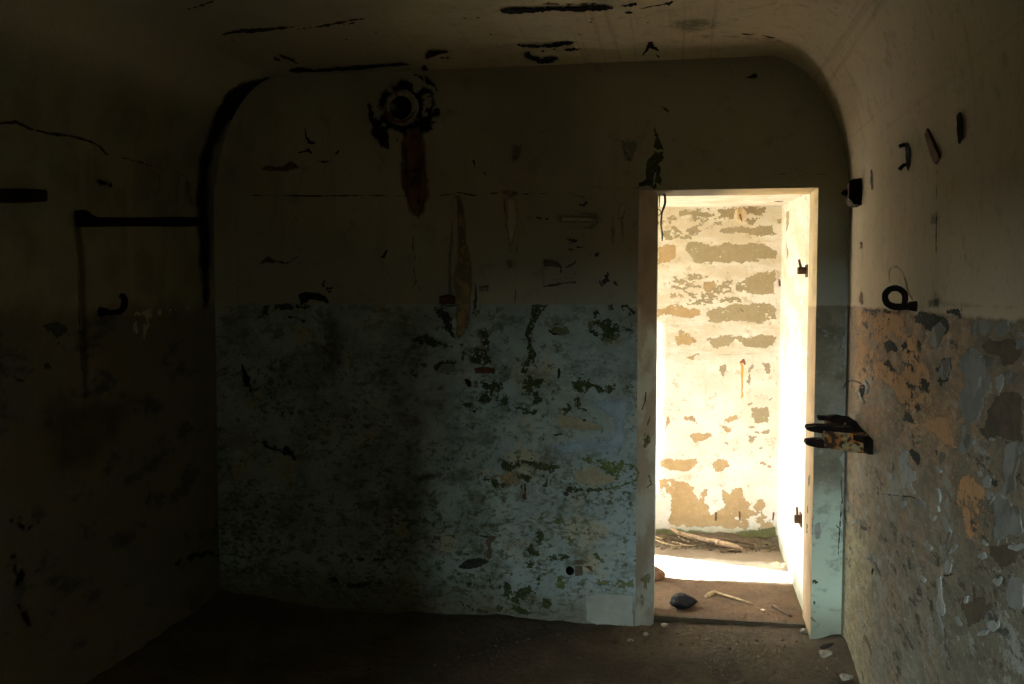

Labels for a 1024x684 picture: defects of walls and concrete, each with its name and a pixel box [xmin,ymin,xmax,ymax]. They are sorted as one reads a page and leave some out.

spalling [500,2,637,23]
corrosion [396,126,429,216]
spalling [657,206,789,360]
spalling [684,415,738,445]
spalling [747,398,772,468]
flaking render [857,311,958,473]
spalling [658,458,774,530]
peeling [886,338,1024,636]